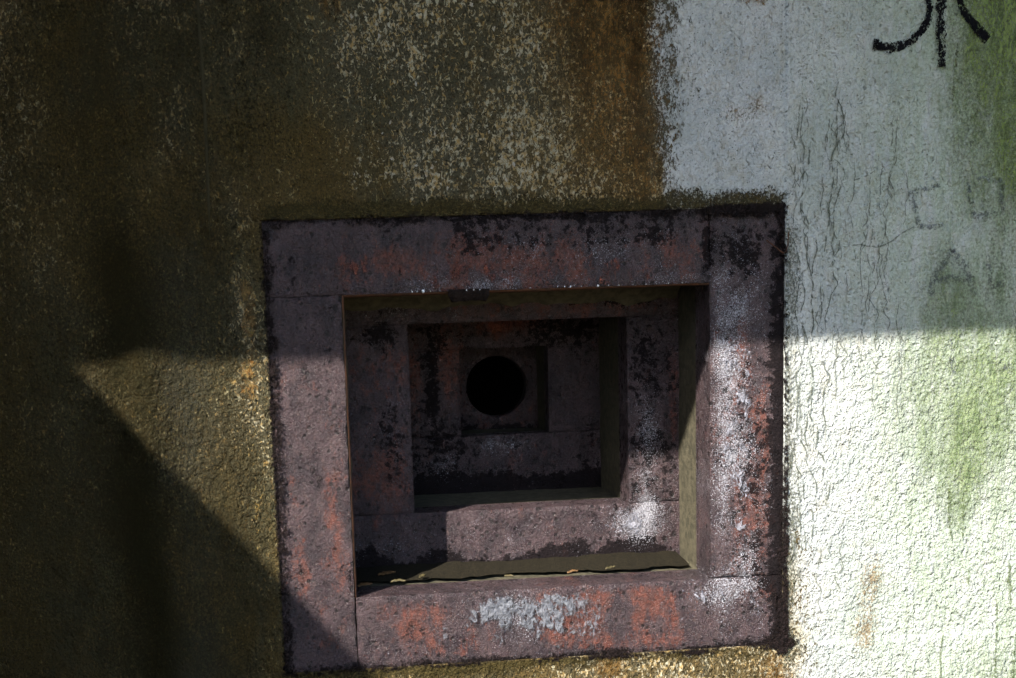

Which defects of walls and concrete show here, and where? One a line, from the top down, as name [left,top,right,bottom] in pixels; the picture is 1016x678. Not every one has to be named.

damp [0,0,273,678]
damp [613,510,659,534]
crack [786,85,919,623]